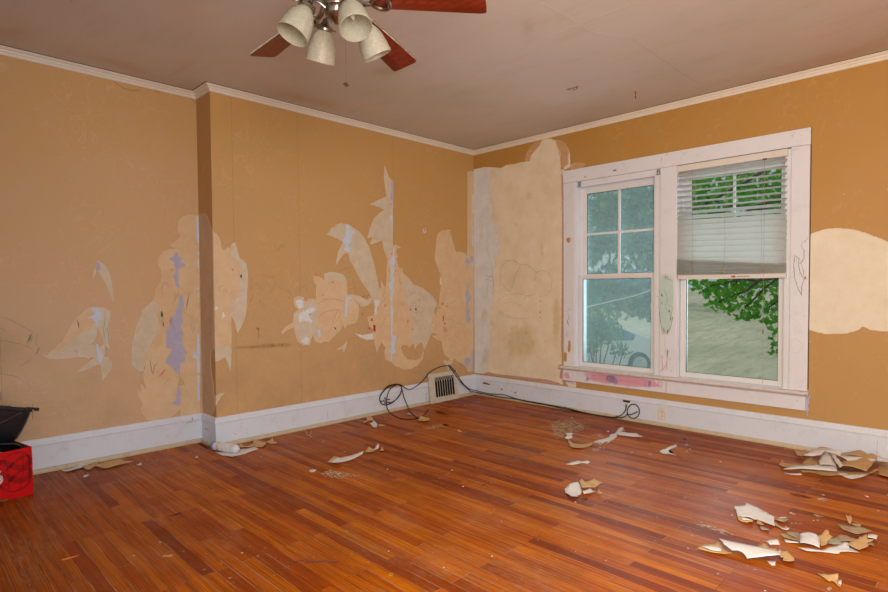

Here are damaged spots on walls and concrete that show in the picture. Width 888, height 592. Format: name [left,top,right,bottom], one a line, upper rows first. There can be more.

peeling [342,225,355,252]
peeling [166,253,200,401]
peeling [374,247,396,362]